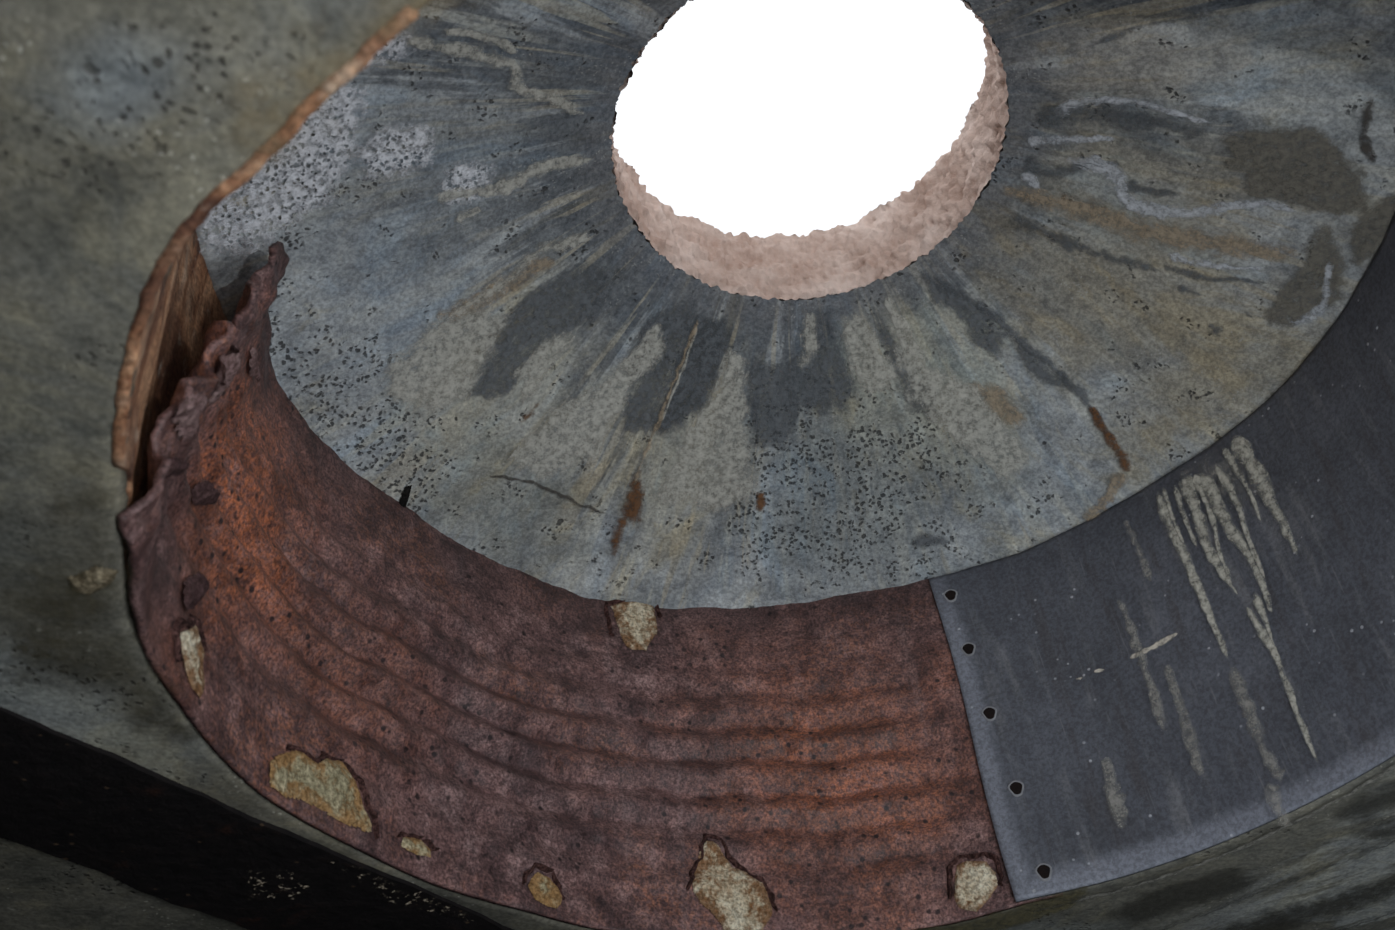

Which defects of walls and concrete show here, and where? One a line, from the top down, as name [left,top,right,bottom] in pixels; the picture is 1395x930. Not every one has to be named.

water stain [367,28,578,113]
water stain [439,155,591,222]
water stain [389,233,625,410]
water stain [924,274,1070,389]
water stain [510,298,1041,511]
corrosion [756,493,766,511]
peeling [172,614,208,697]
peeling [604,599,662,651]
peeling [269,744,380,840]
peeling [522,862,565,909]
peeling [686,833,778,930]
peeling [946,852,1004,912]